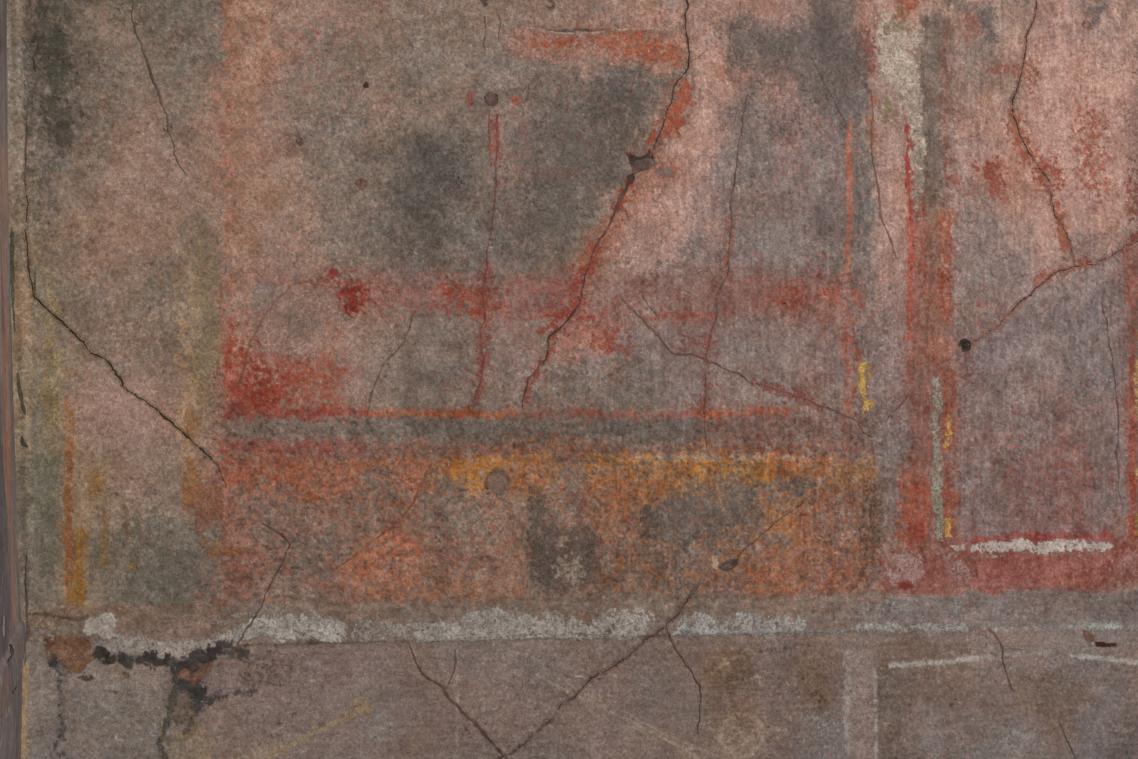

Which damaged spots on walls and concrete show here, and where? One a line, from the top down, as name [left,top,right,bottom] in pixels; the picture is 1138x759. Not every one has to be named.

crack [10,114,227,486]
leakage [367,62,665,273]
crack [522,0,708,408]
crack [621,57,913,449]
crack [930,0,1138,365]
crack [8,551,30,693]
leakage [92,607,656,759]
crack [409,583,702,759]
leakage [671,598,970,638]